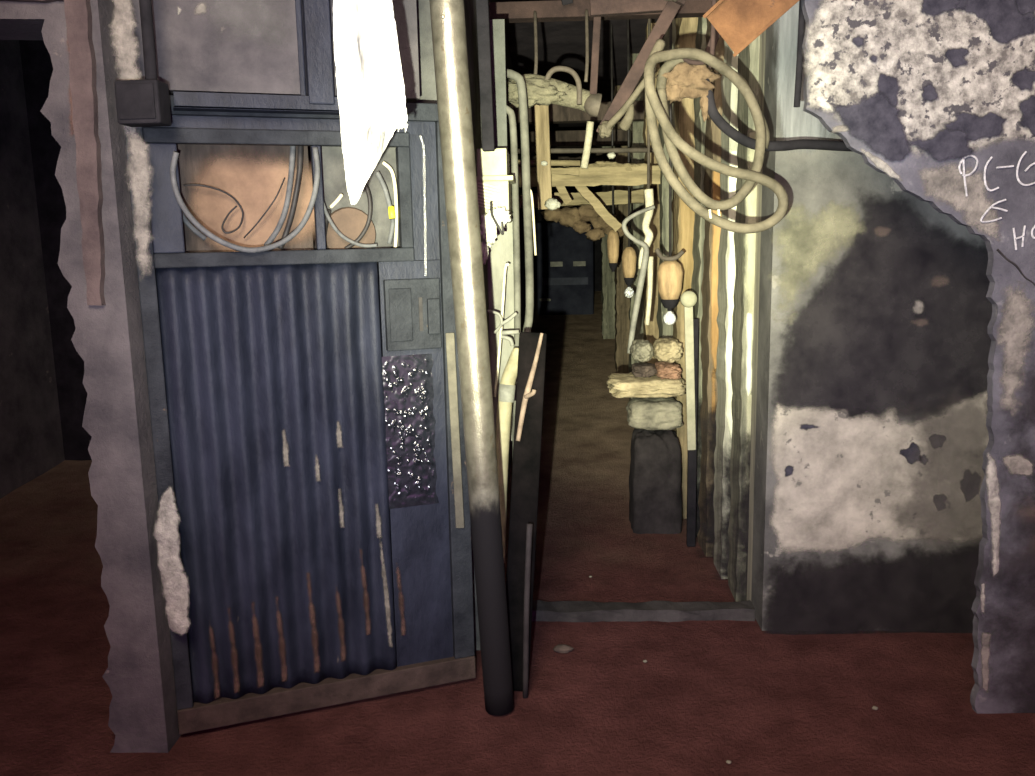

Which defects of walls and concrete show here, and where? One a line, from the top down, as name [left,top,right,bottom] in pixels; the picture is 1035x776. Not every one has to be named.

peeling [807,0,1035,238]
water stain [779,205,860,299]
crack [996,249,1035,286]
spalling [154,488,190,635]
flaking render [771,392,1033,612]
spalling [981,633,991,691]